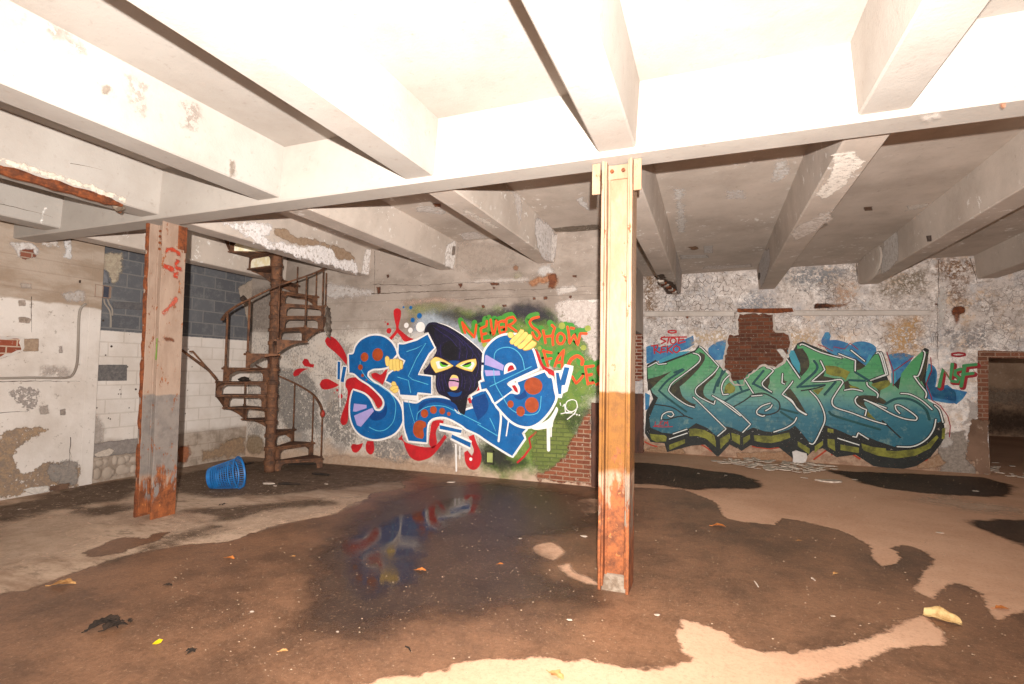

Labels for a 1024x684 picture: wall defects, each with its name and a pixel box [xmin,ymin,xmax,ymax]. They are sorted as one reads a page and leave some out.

corrosion [0,165,125,213]
peeling [815,151,866,199]
peeling [224,222,373,299]
flaking render [0,336,39,359]
crack [646,272,751,332]
flaking render [722,312,792,386]
crack [785,263,888,341]
crack [933,258,1016,368]
spalling [0,427,81,498]